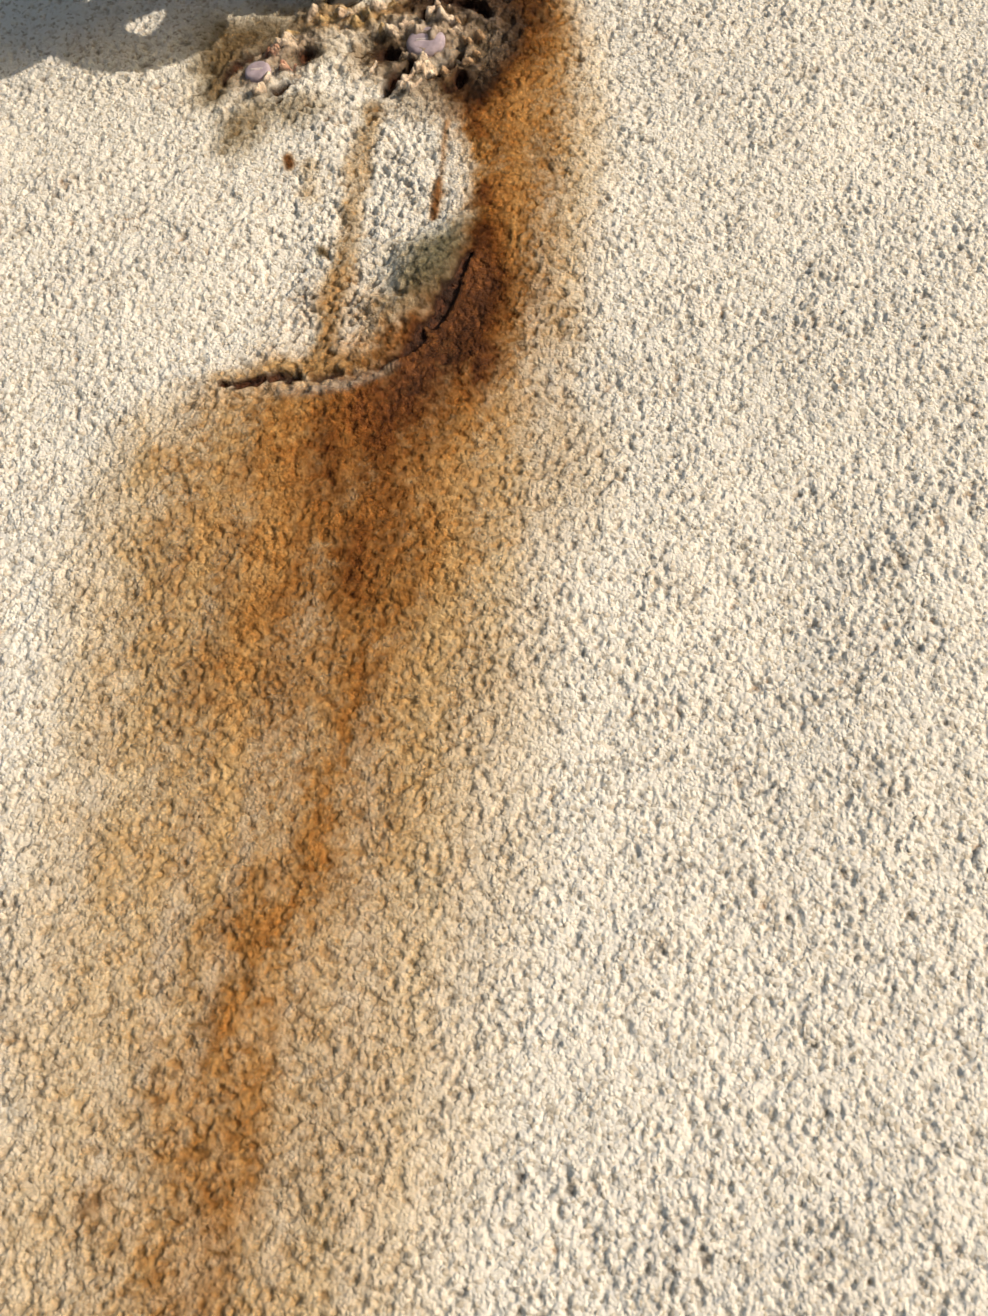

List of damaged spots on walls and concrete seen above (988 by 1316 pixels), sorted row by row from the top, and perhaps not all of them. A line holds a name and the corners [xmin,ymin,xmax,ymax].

flaking render [223,0,492,104]
crack [219,252,473,391]
corrosion [90,0,575,1316]